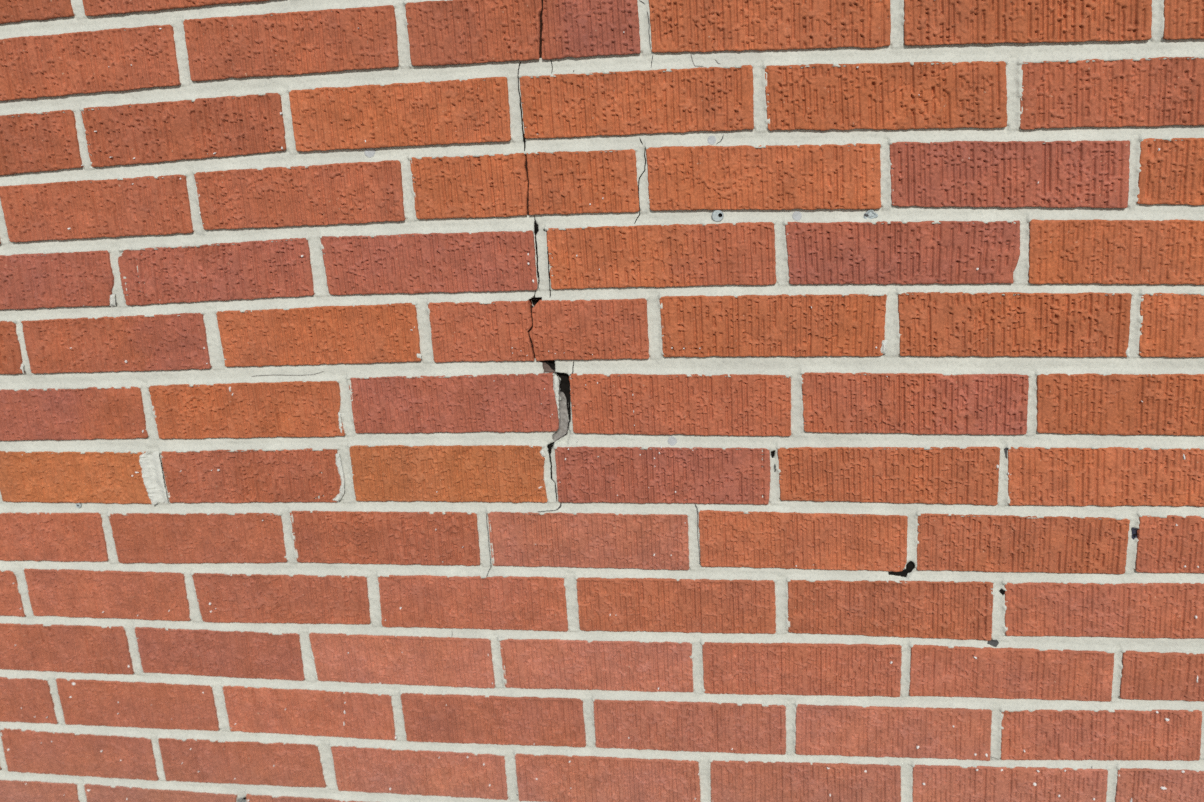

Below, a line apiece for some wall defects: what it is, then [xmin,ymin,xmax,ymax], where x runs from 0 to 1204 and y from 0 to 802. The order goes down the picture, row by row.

crack [518,0,574,512]